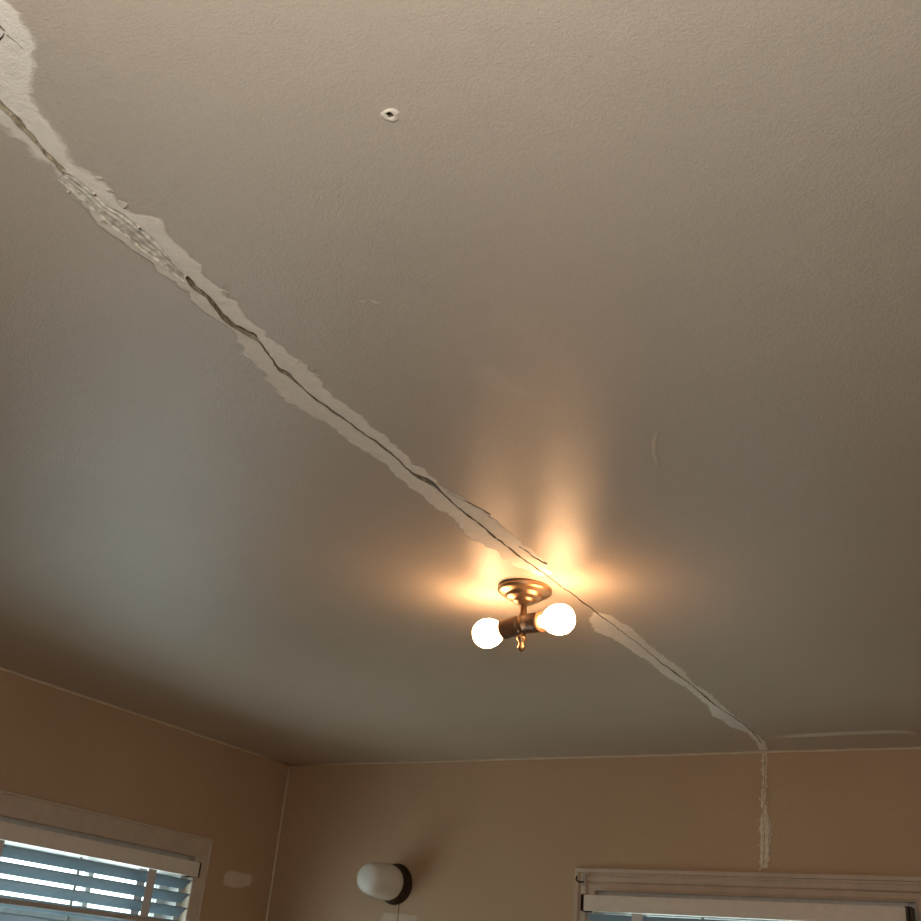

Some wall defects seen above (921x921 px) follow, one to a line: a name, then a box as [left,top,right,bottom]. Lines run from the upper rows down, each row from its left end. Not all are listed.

peeling [0,0,554,576]
crack [0,100,773,872]